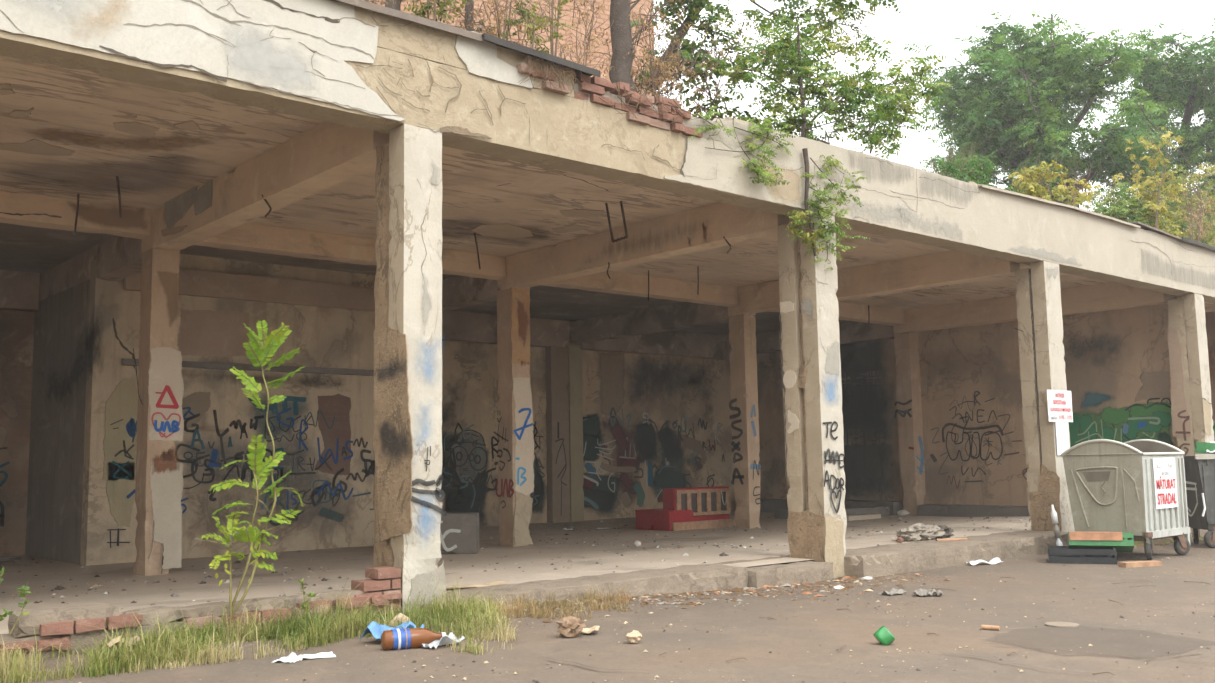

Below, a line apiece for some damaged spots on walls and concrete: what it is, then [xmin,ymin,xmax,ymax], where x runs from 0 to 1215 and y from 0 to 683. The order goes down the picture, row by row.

water stain [37,130,205,151]
crack [99,0,548,142]
flaking render [516,63,748,151]
crack [601,138,717,180]
crack [417,179,463,280]
flaking render [780,301,794,313]
flaking render [783,365,807,389]
flaking render [102,309,250,569]
flaking render [787,410,799,434]
spalling [788,510,845,590]